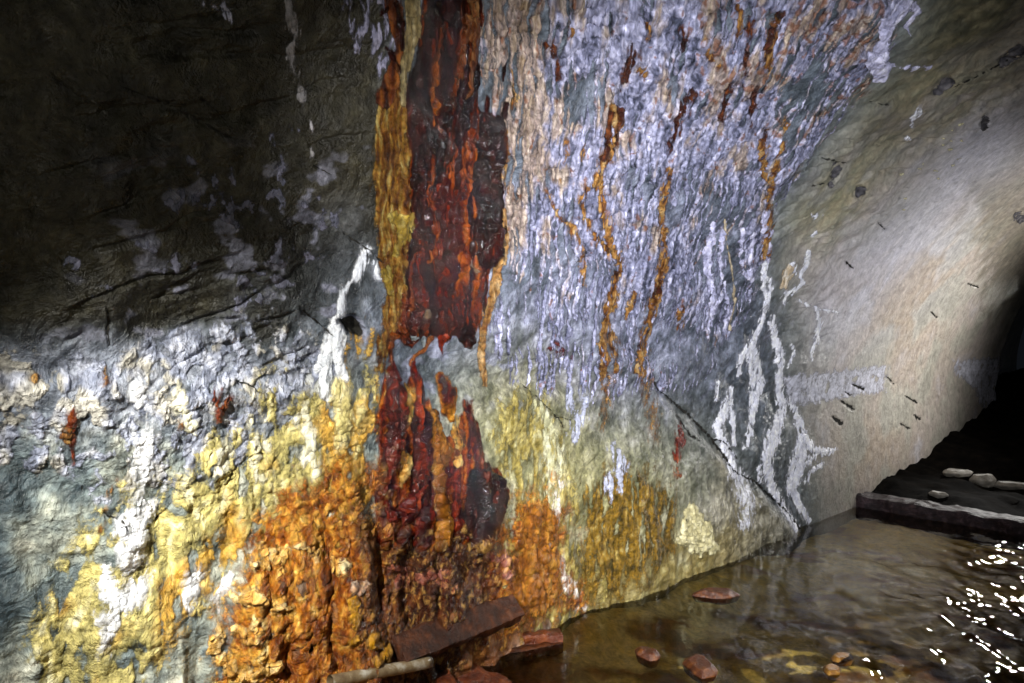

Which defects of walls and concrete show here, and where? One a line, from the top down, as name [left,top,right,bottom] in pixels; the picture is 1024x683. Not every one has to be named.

water stain [164,134,286,229]
corrosion [544,87,698,440]
corrosion [617,43,649,92]
water stain [480,0,932,632]
corrosion [718,4,791,261]
corrosion [59,407,78,466]
water stain [0,237,382,683]
corrosion [212,388,233,424]
crack [648,360,802,531]
corrosion [502,503,572,618]